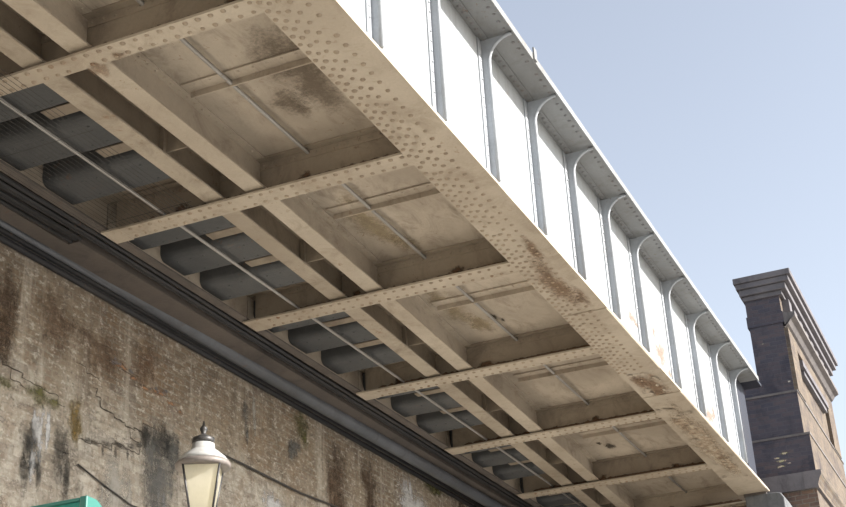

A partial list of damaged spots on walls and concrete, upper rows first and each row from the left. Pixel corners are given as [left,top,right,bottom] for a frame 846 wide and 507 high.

rust [526,240,588,303]
leakage [0,270,18,362]
crack [0,357,65,407]
crack [79,345,154,447]
rust [627,370,671,396]
leakage [20,401,81,490]
leakage [144,431,179,507]
leakage [328,459,345,507]
leakage [362,463,375,507]
rust [543,405,748,481]